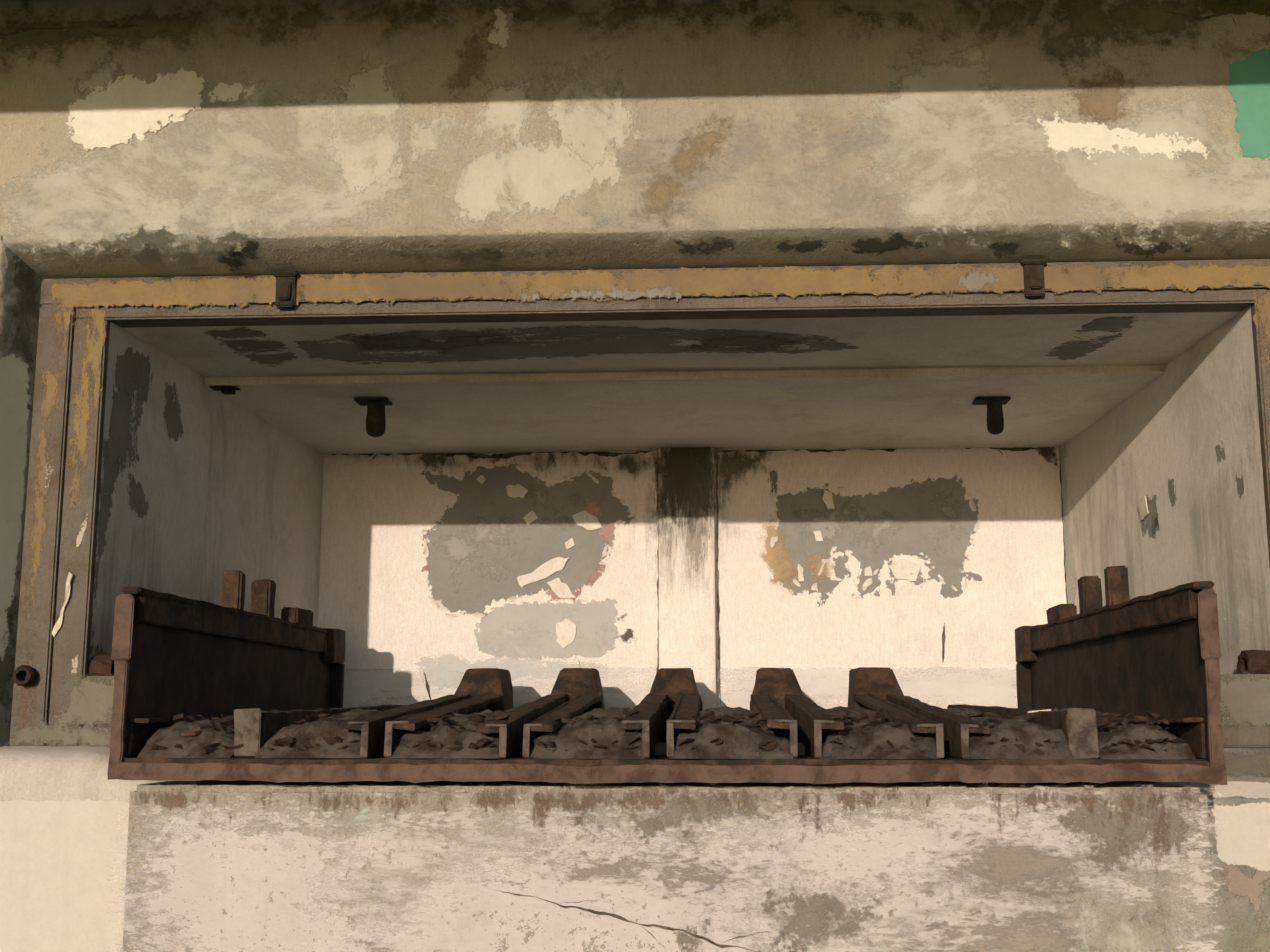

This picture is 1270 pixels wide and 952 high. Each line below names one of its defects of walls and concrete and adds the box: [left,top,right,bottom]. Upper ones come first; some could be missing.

damp [0,3,204,65]
damp [478,0,791,32]
damp [958,0,1211,66]
peeling [71,347,183,674]
peeling [421,461,637,660]
damp [598,447,767,571]
peeling [762,470,982,606]
corrosion [477,787,515,812]
corrosion [533,789,664,827]
corrosion [837,788,895,812]
corrosion [1017,791,1169,854]
crack [499,890,795,952]